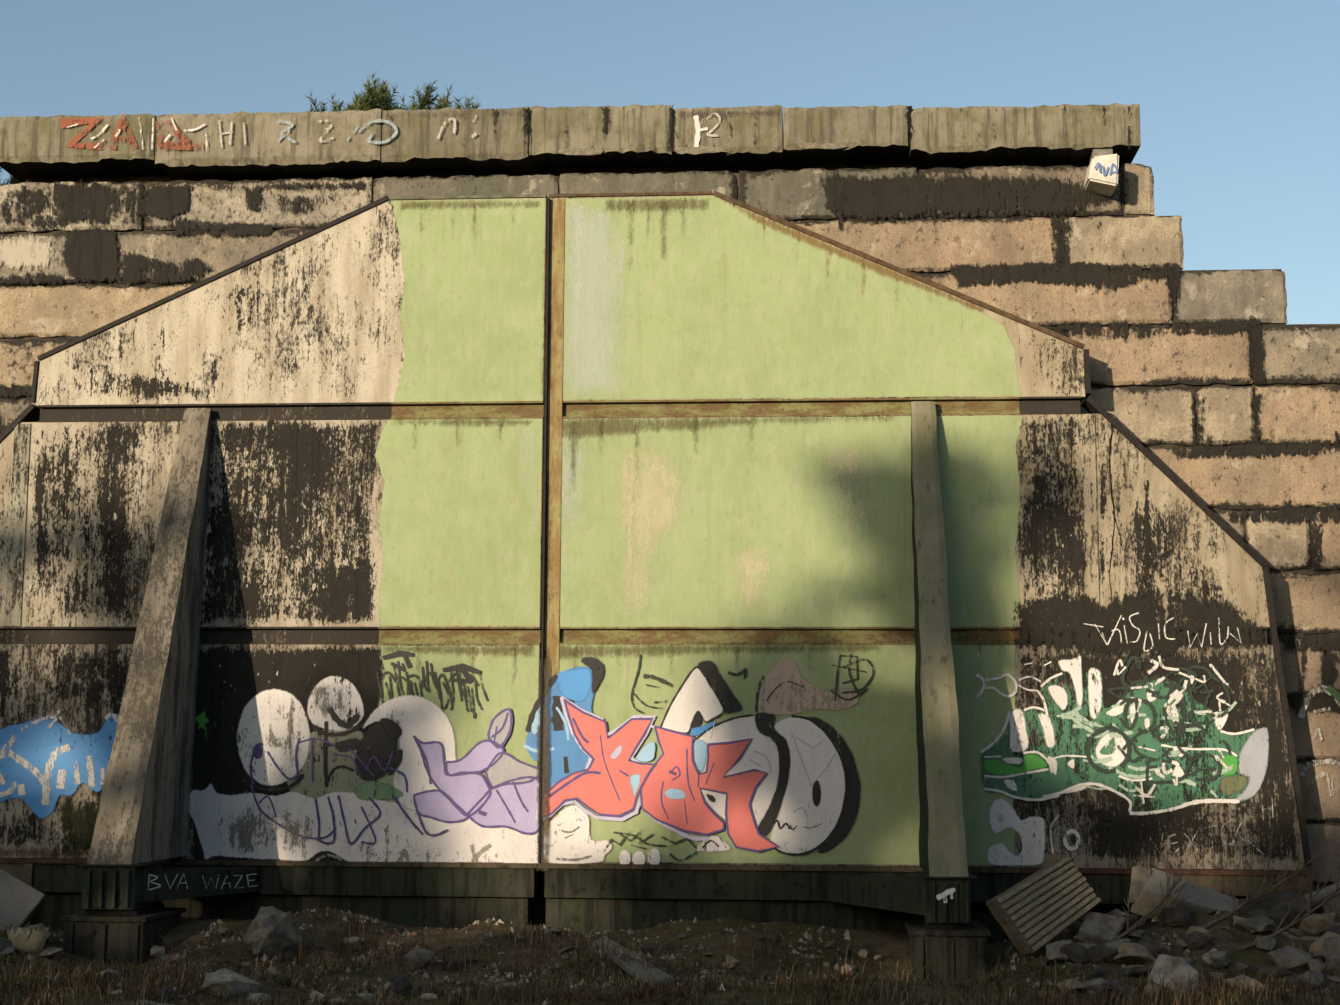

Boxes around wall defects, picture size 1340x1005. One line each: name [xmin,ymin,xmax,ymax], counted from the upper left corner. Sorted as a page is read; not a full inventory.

damp [819,172,1340,461]
damp [0,649,130,740]
damp [0,813,49,847]
damp [65,757,110,830]